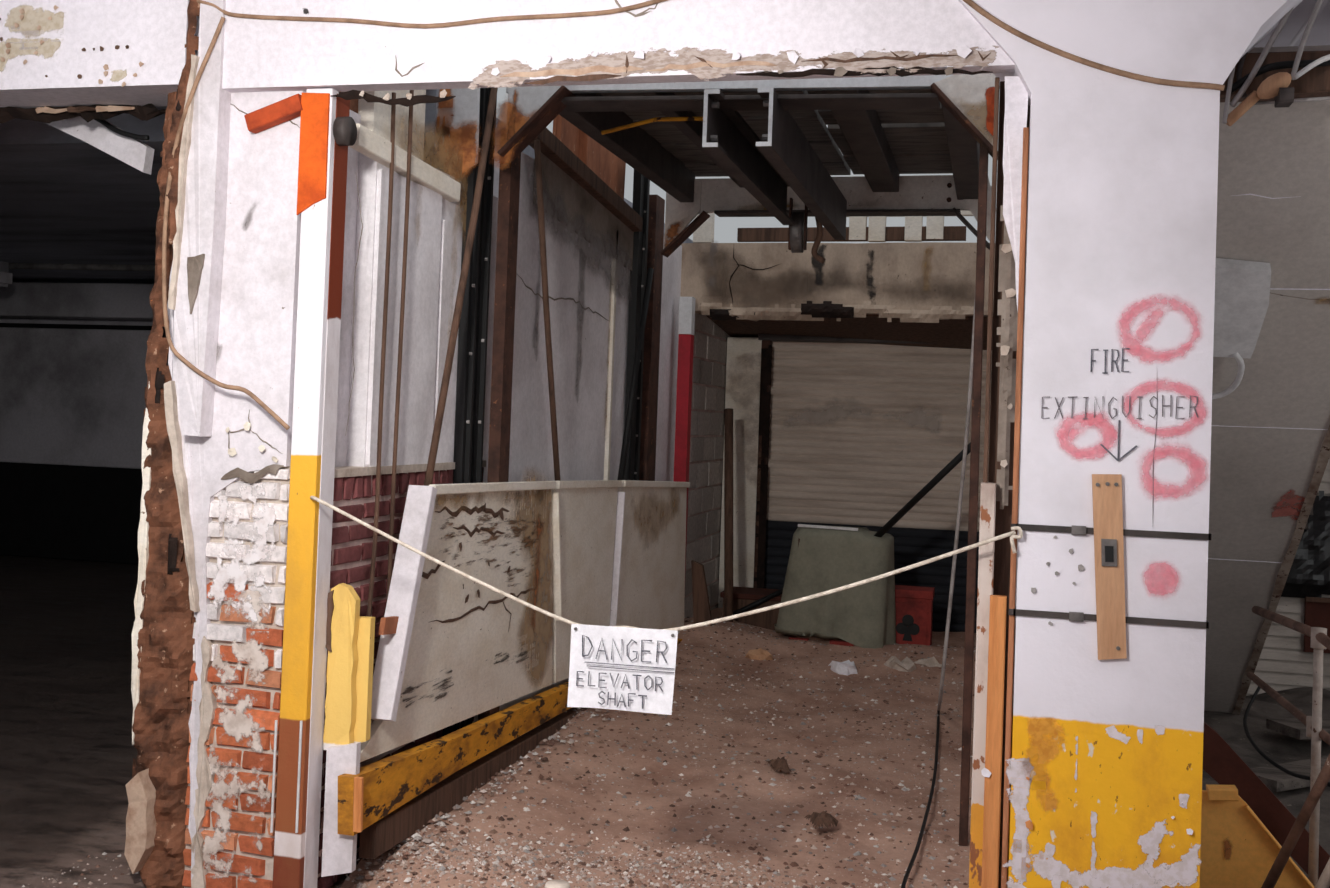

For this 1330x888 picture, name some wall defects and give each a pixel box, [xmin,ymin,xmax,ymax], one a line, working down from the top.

peeling [468,45,998,90]
flaking render [697,205,1018,509]
spalling [0,0,291,888]
crack [422,561,445,579]
crack [430,583,541,631]
leakage [436,474,553,681]
peeling [981,718,1202,888]